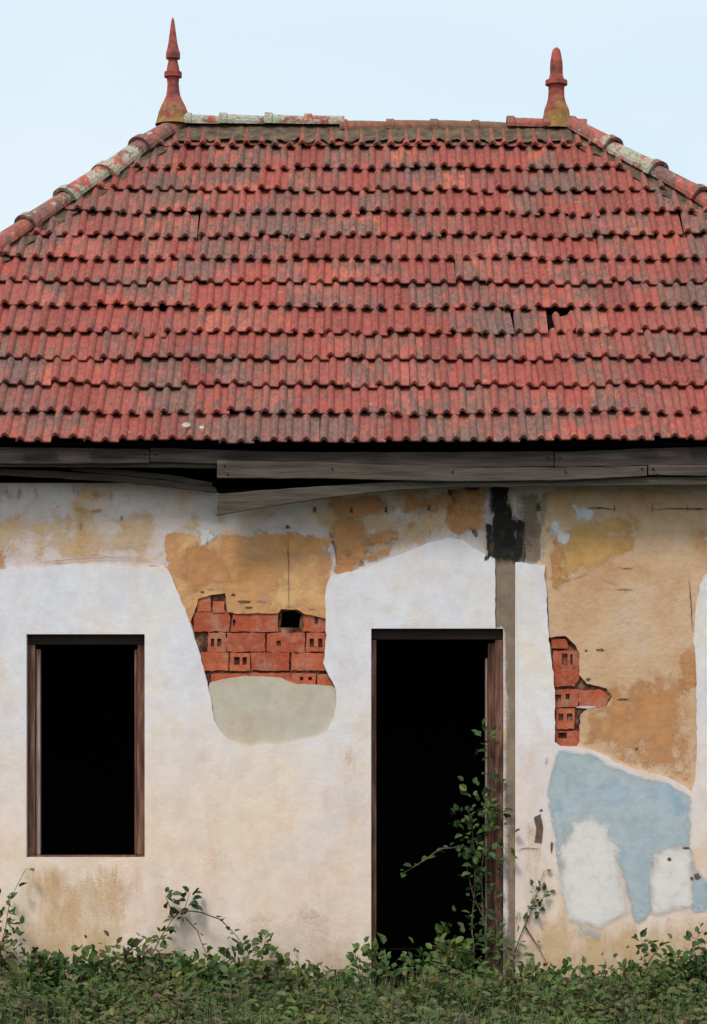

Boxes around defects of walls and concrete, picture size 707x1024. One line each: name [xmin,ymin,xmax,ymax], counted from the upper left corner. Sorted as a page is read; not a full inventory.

spalling [552,310,582,335]
flaking render [165,487,488,746]
leakage [0,486,707,984]
flaking render [534,487,707,943]